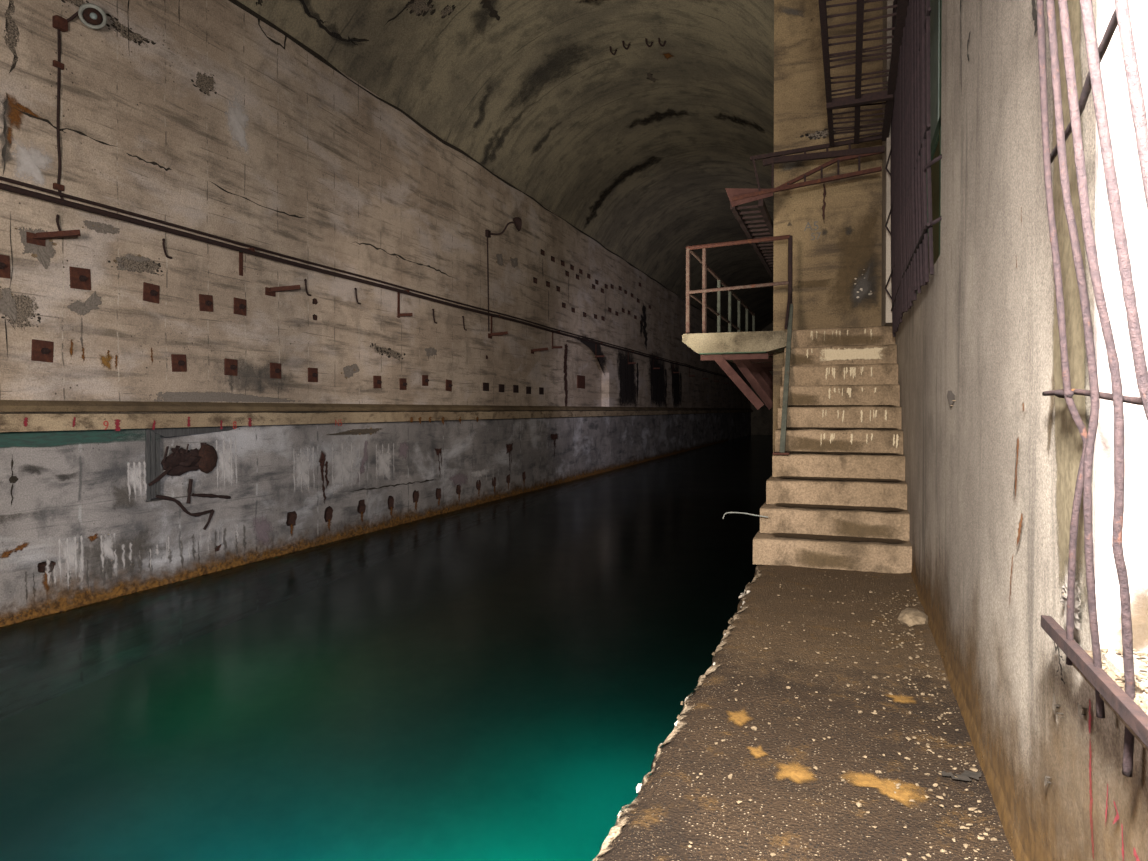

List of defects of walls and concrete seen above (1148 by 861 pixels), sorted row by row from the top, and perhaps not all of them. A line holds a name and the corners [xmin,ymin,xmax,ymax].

crack [0,0,171,174]
rust [6,94,40,146]
crack [228,0,722,325]
crack [210,181,303,218]
spalling [15,227,57,269]
spalling [108,254,163,275]
rust [0,543,28,558]